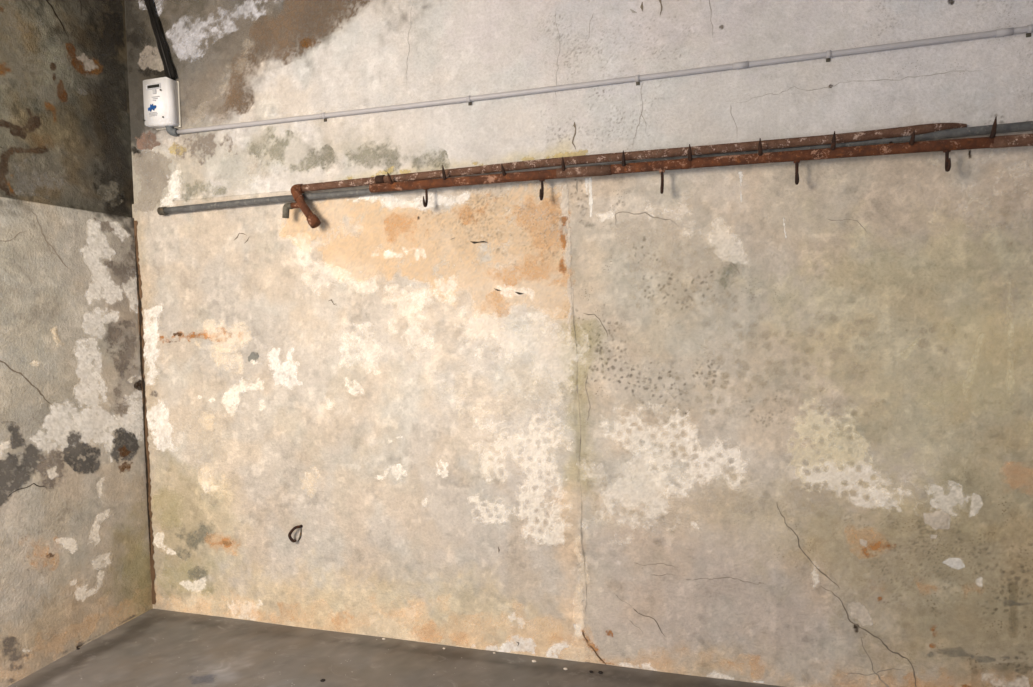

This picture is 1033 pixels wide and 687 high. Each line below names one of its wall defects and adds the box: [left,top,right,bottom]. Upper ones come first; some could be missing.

leakage [282,183,570,318]
crack [0,361,52,405]
peeling [30,220,144,461]
corrosion [160,327,242,342]
leakage [37,450,64,488]
leakage [605,408,746,500]
efflorescence [790,414,911,511]
efflorescence [929,483,983,516]
crack [615,594,664,635]
crack [777,505,916,687]